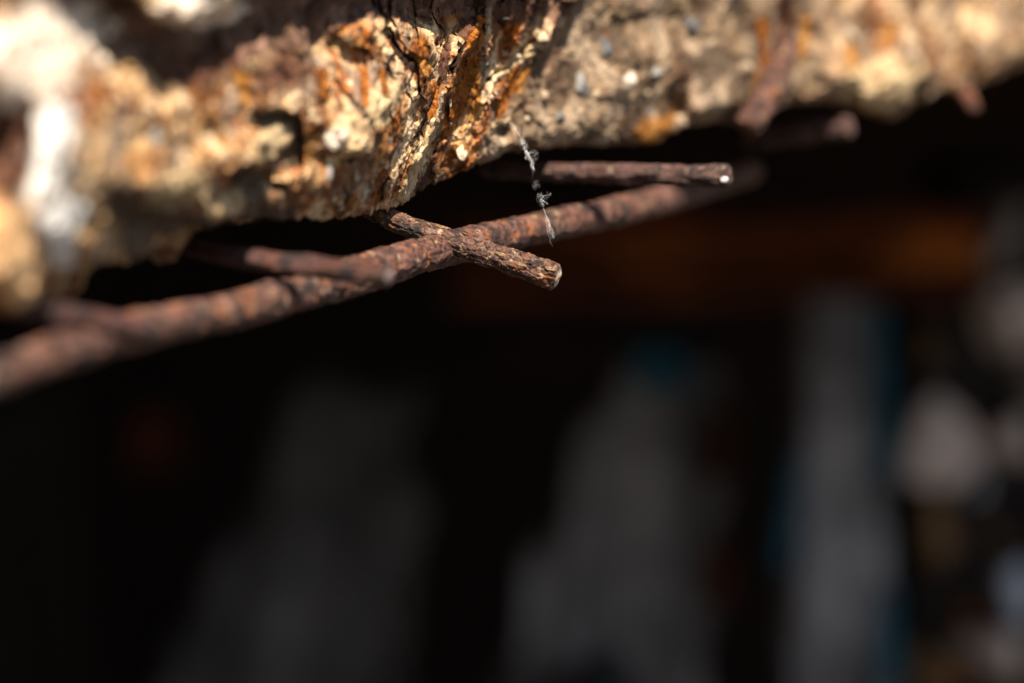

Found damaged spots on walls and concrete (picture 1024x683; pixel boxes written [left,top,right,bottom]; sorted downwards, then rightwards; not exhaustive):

corrosion [143,46,330,110]
peeling [245,123,293,163]
spalling [324,70,403,157]
corrosion [360,66,388,109]
crack [381,25,421,77]
crack [410,95,434,147]
spalling [395,98,467,206]
crack [447,21,476,74]
corrosion [411,0,539,175]
spalling [491,118,517,137]
spalling [489,32,551,98]
corrosion [0,109,60,308]